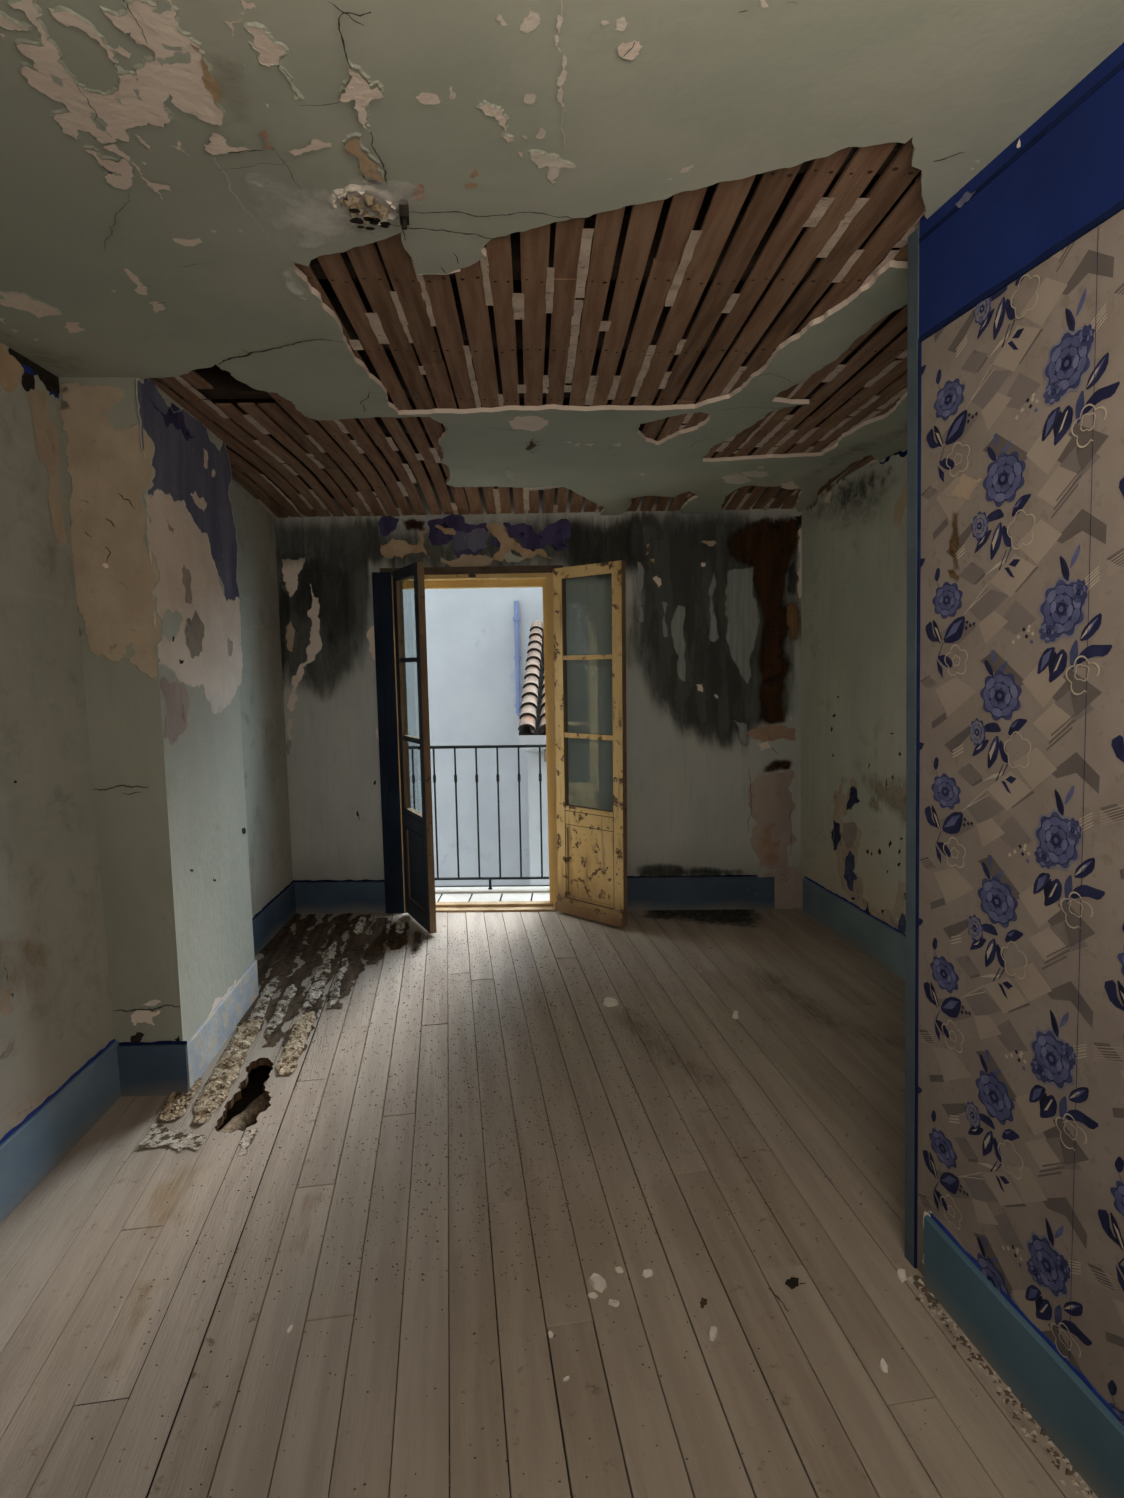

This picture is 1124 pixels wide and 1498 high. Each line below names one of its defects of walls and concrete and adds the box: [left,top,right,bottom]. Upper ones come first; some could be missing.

crack [300,1,371,106]
flaking render [0,0,925,518]
crack [370,132,595,274]
flaking render [703,304,908,599]
flaking render [60,381,243,745]
peeling [282,552,323,754]
peeling [366,626,375,660]
water stain [275,511,801,745]
spalling [747,717,802,909]